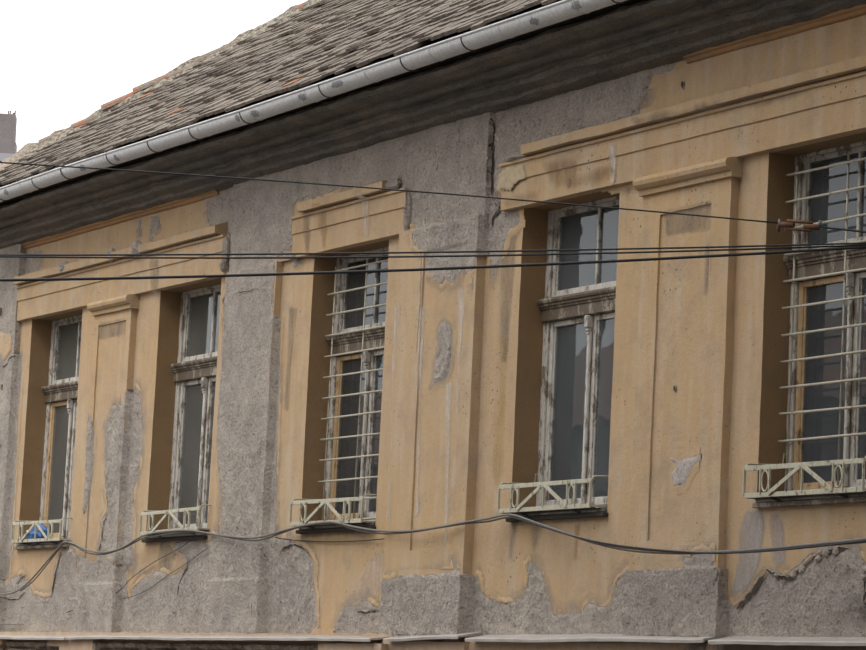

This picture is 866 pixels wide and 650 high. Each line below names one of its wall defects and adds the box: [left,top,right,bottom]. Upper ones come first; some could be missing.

flaking render [0,62,676,650]
flaking render [333,543,866,650]